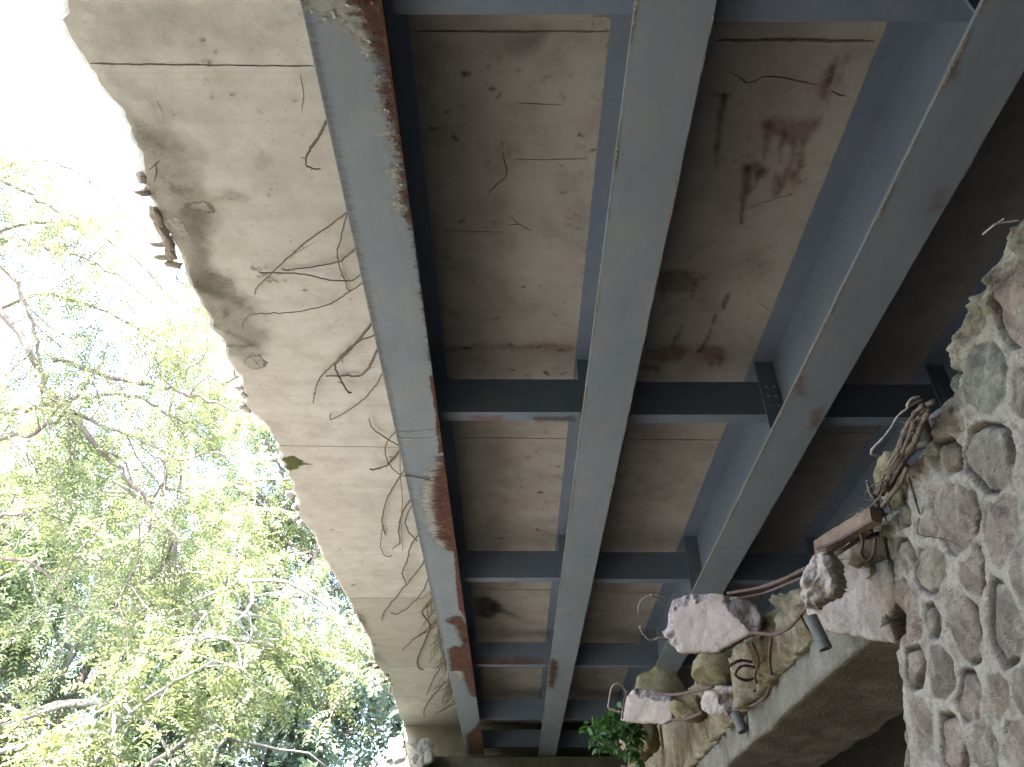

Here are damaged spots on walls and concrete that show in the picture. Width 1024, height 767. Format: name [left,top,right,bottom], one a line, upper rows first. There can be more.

crack [730,72,846,97]
rust [346,0,425,321]
spalling [130,170,214,269]
rust [429,375,534,697]
rust [465,722,485,756]